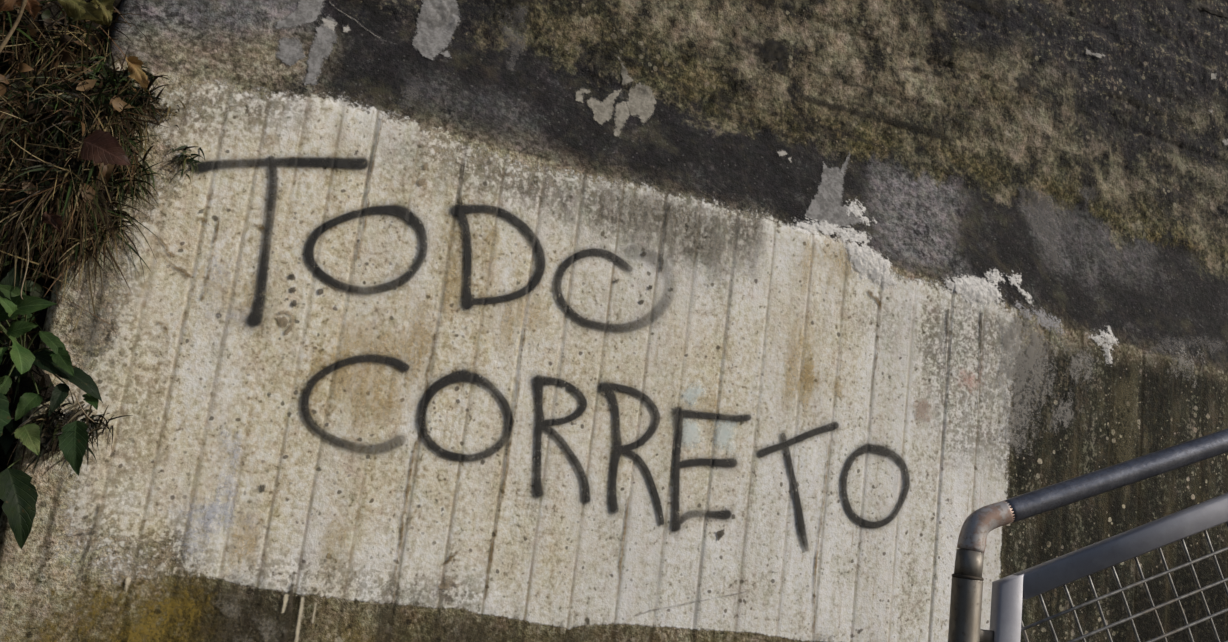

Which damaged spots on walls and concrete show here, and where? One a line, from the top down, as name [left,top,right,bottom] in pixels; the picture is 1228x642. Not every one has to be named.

peeling [412,0,461,60]
peeling [575,57,657,137]
peeling [805,152,864,227]
water stain [792,199,898,289]
water stain [944,269,1064,334]
water stain [1088,326,1119,367]
water stain [204,582,296,642]